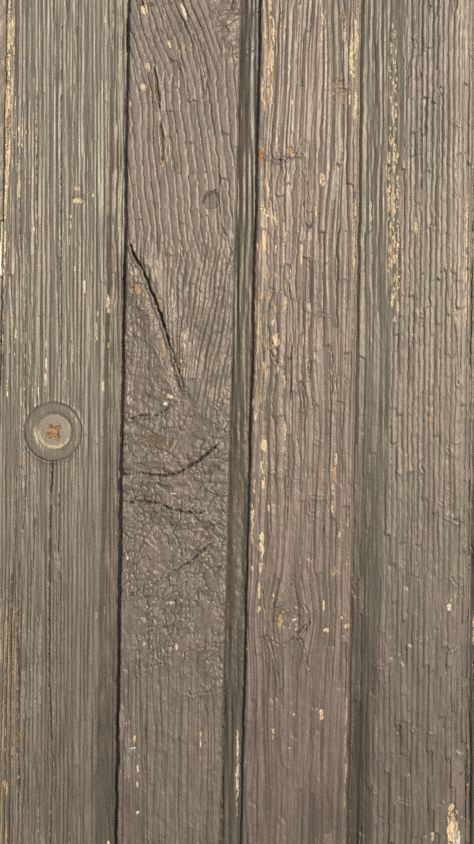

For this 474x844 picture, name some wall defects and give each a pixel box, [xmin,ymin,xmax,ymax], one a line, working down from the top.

peeling [261,0,285,111]
peeling [333,0,360,151]
crack [19,95,38,408]
crack [57,69,65,382]
peeling [388,22,413,382]
crack [130,245,183,419]
crack [129,543,211,596]
crack [124,440,219,514]
peeling [251,503,265,572]
peeling [254,439,267,493]
crack [10,462,61,844]
peeling [447,761,465,844]